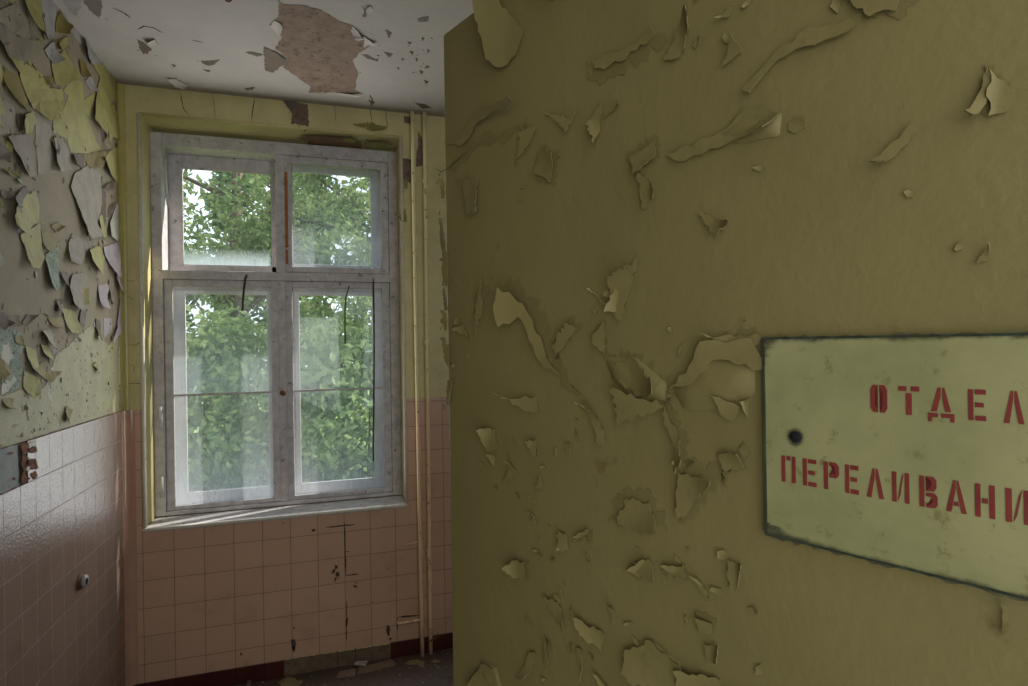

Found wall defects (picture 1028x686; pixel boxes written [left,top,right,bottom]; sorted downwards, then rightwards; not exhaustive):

spalling [137,39,157,55]
peeling [245,0,433,151]
peeling [472,0,524,68]
peeling [586,0,701,85]
peeling [741,0,919,93]
peeling [625,106,806,210]
peeling [0,0,125,494]
crack [326,523,358,576]